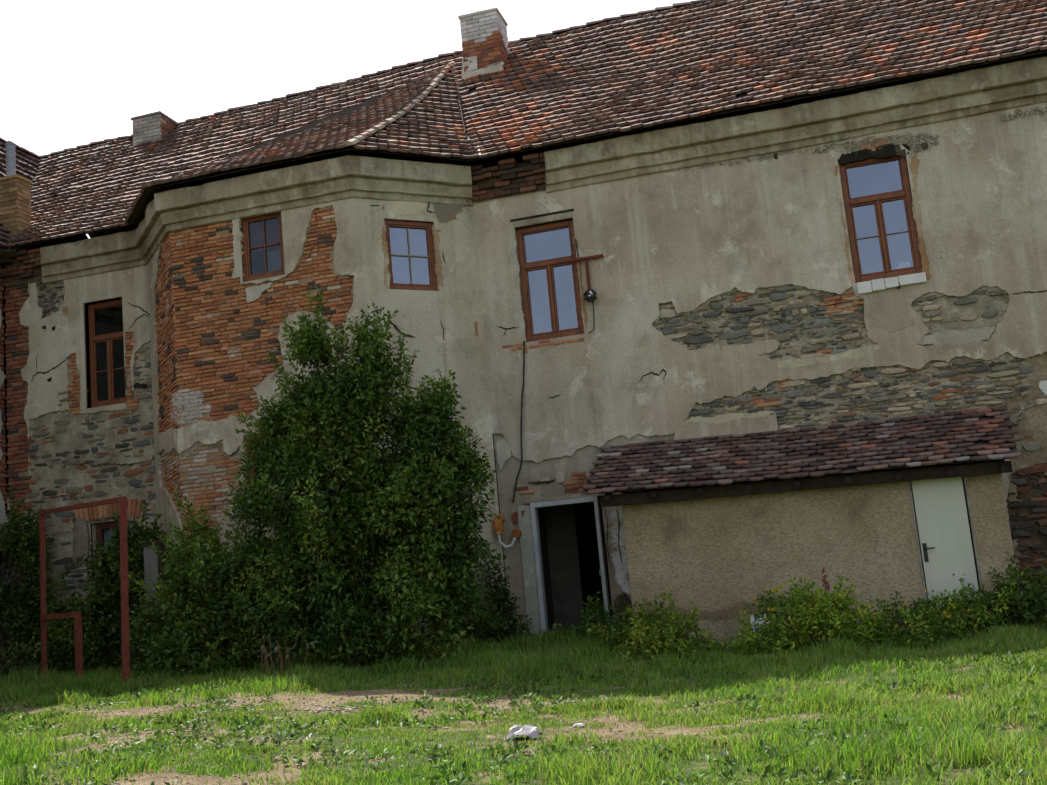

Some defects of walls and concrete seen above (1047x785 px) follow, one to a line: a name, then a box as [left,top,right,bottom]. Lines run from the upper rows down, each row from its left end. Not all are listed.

crack [128,302,149,330]
crack [31,356,68,383]
flaking render [10,205,354,615]
flaking render [493,433,675,638]
peeling [71,686,464,785]